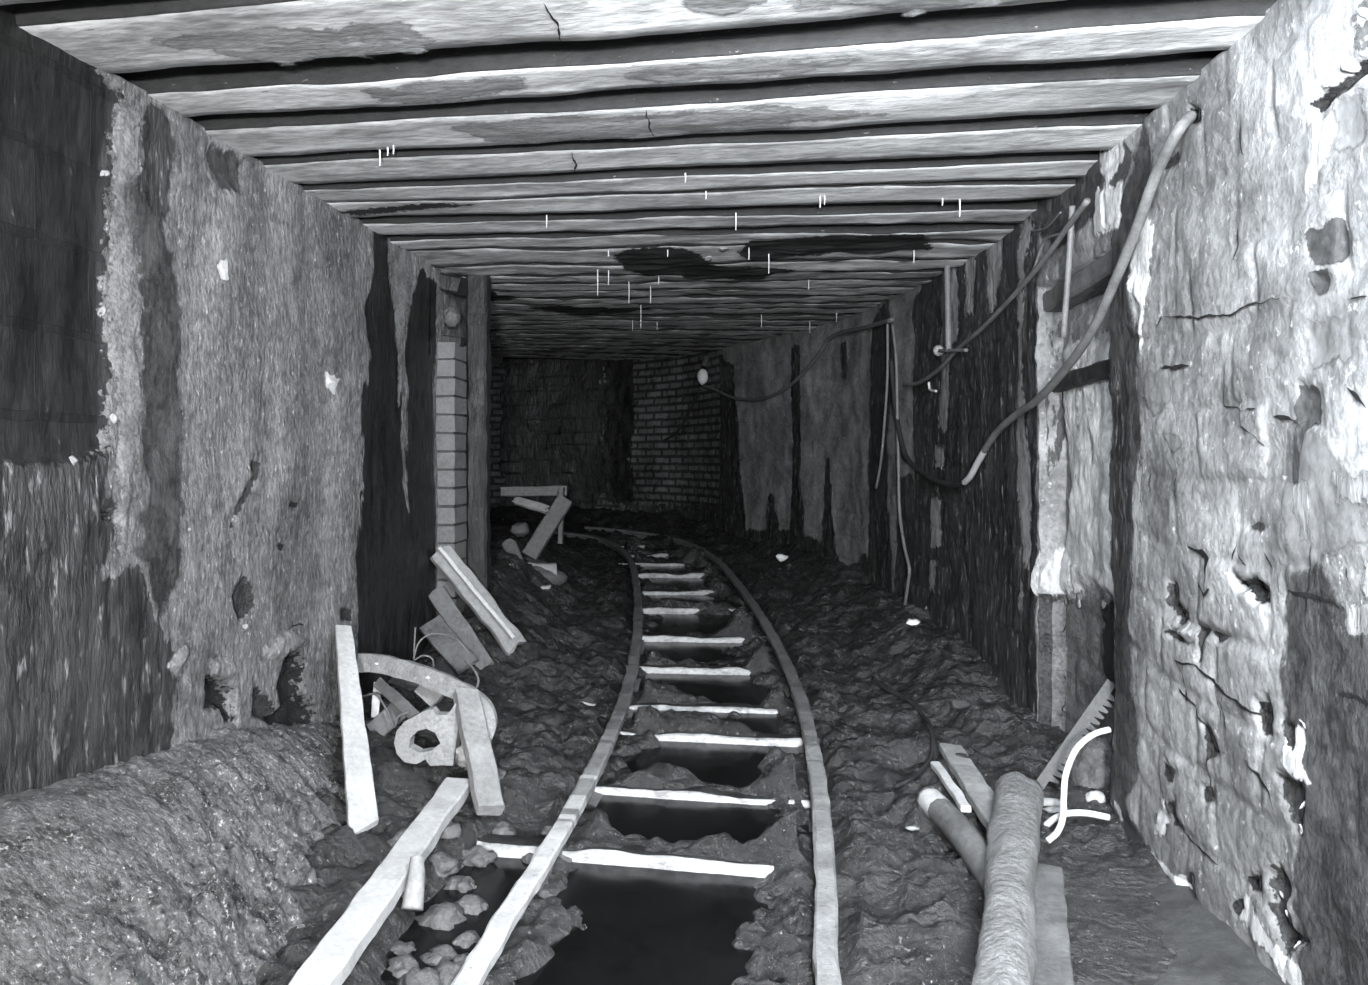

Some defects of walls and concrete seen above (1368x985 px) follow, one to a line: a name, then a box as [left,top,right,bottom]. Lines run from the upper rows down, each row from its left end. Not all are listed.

leakage [151,21,435,66]
leakage [791,0,1004,17]
spalling [1310,0,1368,152]
spalling [1305,217,1350,295]
crack [1157,277,1280,325]
crack [1223,363,1296,446]
leakage [498,345,839,561]
leakage [857,121,1171,846]
spalling [1241,577,1270,603]
crack [1188,544,1349,615]
crack [1174,660,1273,810]
spalling [1233,864,1308,963]